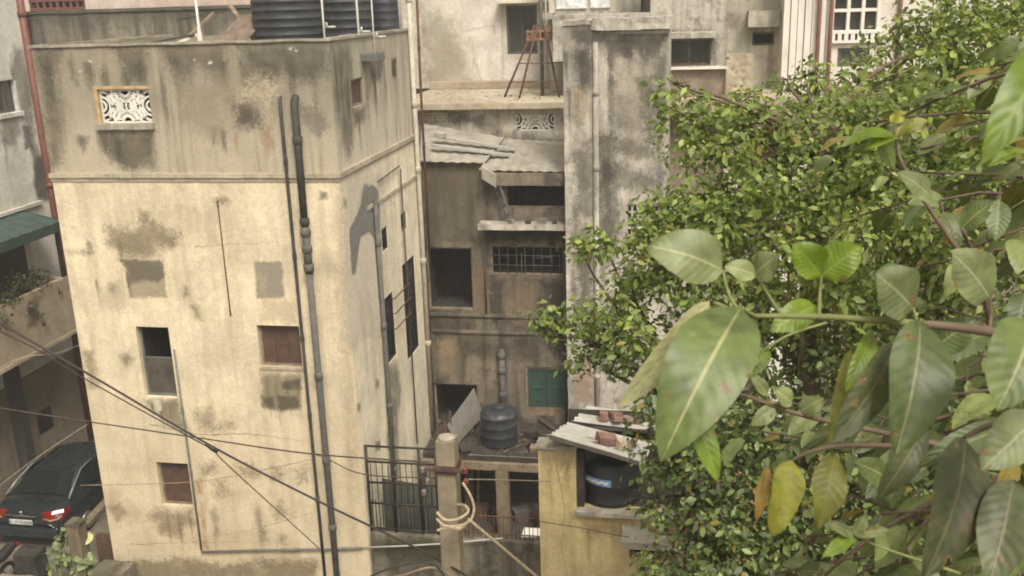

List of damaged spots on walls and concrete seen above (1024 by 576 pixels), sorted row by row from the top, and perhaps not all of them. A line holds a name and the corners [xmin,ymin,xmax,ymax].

damp [238,44,363,151]
damp [105,132,153,168]
damp [485,25,674,356]
damp [105,212,182,292]
damp [261,373,301,411]